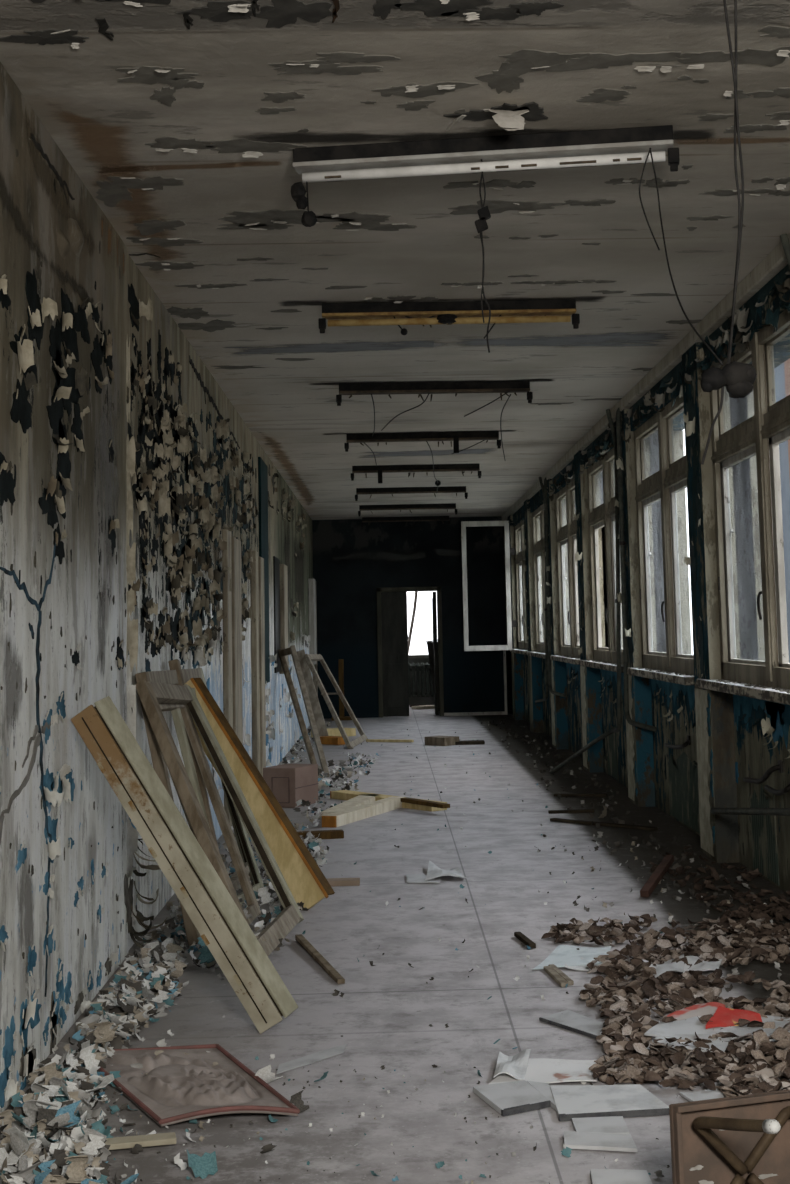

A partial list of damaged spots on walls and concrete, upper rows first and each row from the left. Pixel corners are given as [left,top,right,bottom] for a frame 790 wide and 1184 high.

peeling [0,29,89,49]
peeling [97,0,333,28]
peeling [373,0,564,21]
peeling [360,25,790,133]
peeling [145,128,309,158]
peeling [217,209,417,231]
peeling [0,452,16,516]
peeling [9,261,314,746]
peeling [530,265,790,610]
crack [0,540,56,997]
peeling [651,606,715,856]
peeling [97,800,168,948]